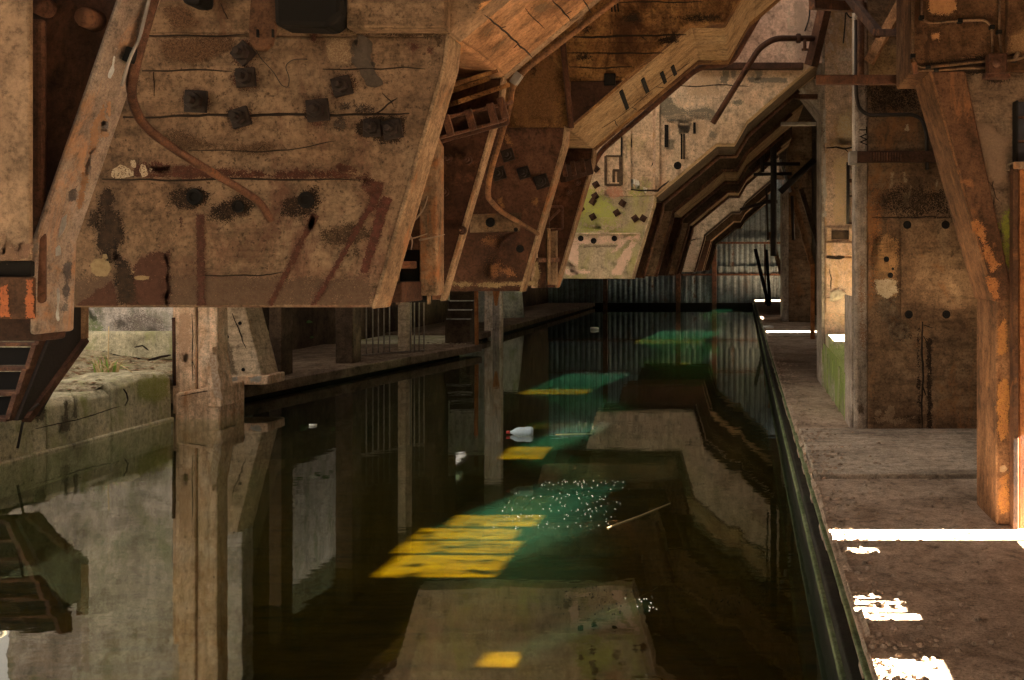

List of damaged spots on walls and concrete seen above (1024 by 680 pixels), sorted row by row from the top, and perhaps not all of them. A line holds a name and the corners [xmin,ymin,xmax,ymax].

rust [0,284,10,317]
rust [24,279,36,319]
leakage [60,185,372,331]
rust [132,159,392,306]